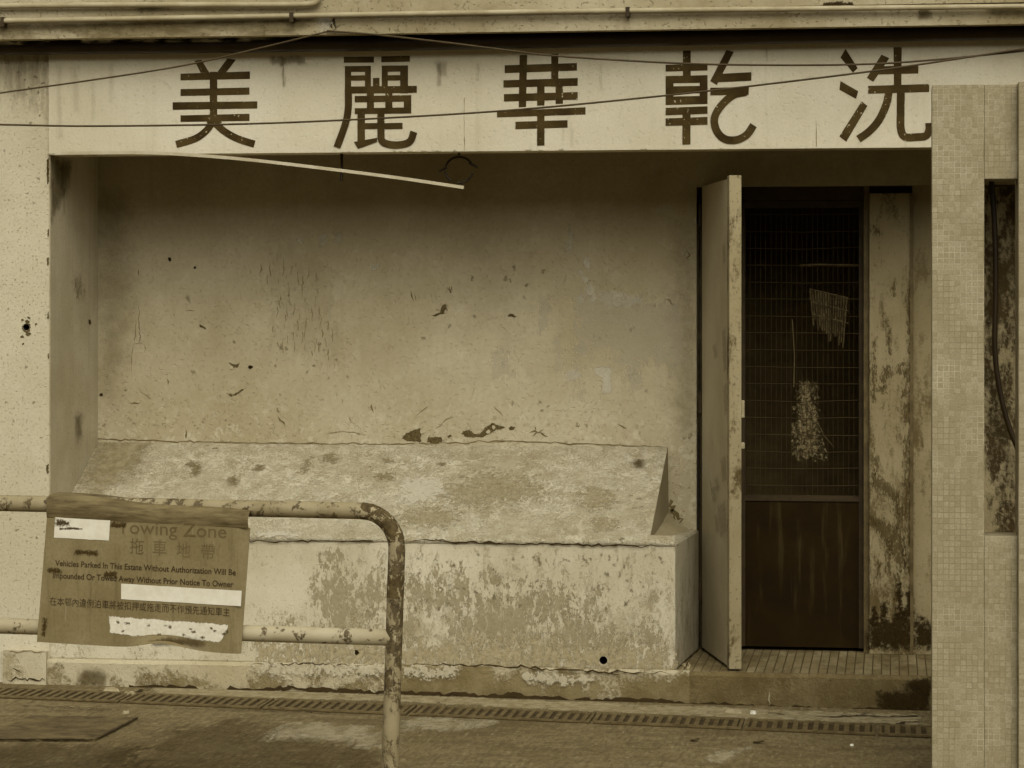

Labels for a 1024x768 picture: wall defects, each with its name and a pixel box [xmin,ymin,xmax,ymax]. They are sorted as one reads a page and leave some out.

crack [98,404,661,447]
spalling [402,422,515,445]
crack [409,499,683,548]
peeling [308,547,387,629]
peeling [402,561,690,686]
damp [866,583,931,651]